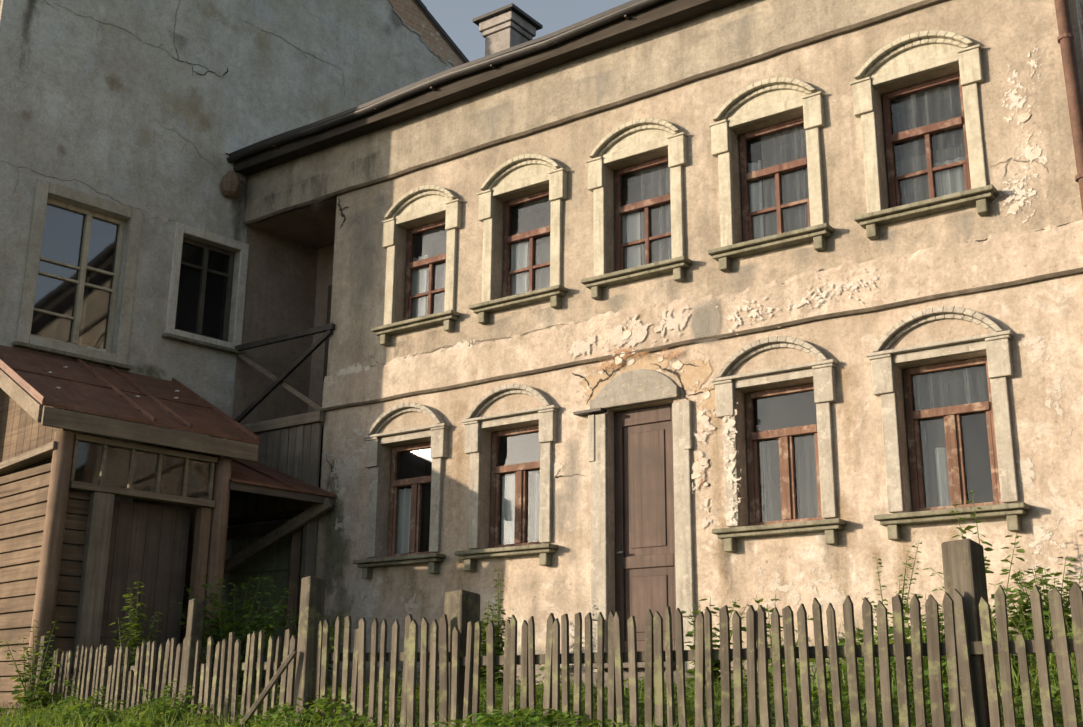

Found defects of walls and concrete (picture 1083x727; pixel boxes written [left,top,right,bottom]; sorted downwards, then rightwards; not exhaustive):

crack [40,0,228,77]
flaking render [389,0,463,67]
peeling [991,42,1049,226]
peeling [716,267,884,337]
crack [572,365,625,404]
flaking render [568,303,741,529]
crack [655,364,715,400]